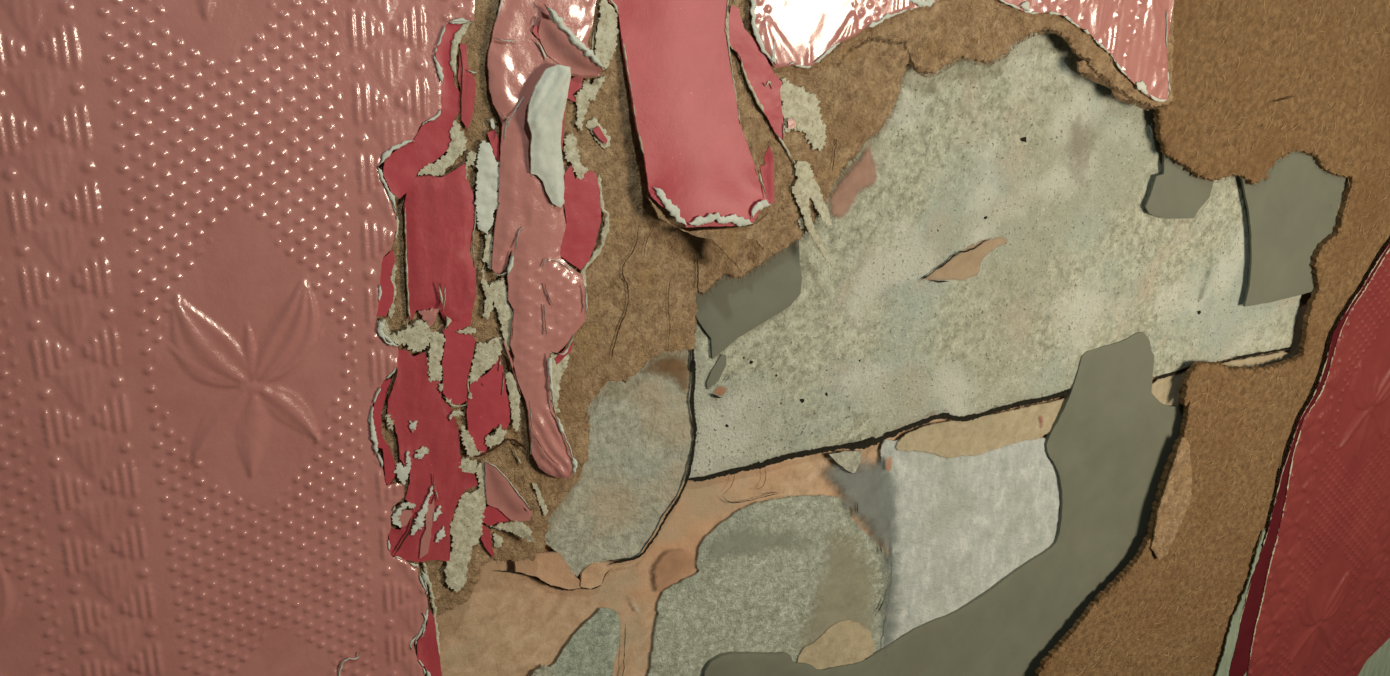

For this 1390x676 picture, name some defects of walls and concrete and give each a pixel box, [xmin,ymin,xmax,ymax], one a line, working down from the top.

peeling [368,21,511,676]
peeling [549,343,573,414]
peeling [560,76,610,288]
crack [611,225,655,359]
peeling [608,0,802,398]
crack [609,253,1071,565]
flaking render [918,237,1007,283]
crack [1154,348,1291,379]
peeling [1240,151,1347,307]
flaking render [495,552,613,591]
flaking render [531,607,626,676]
peeling [648,332,1187,676]